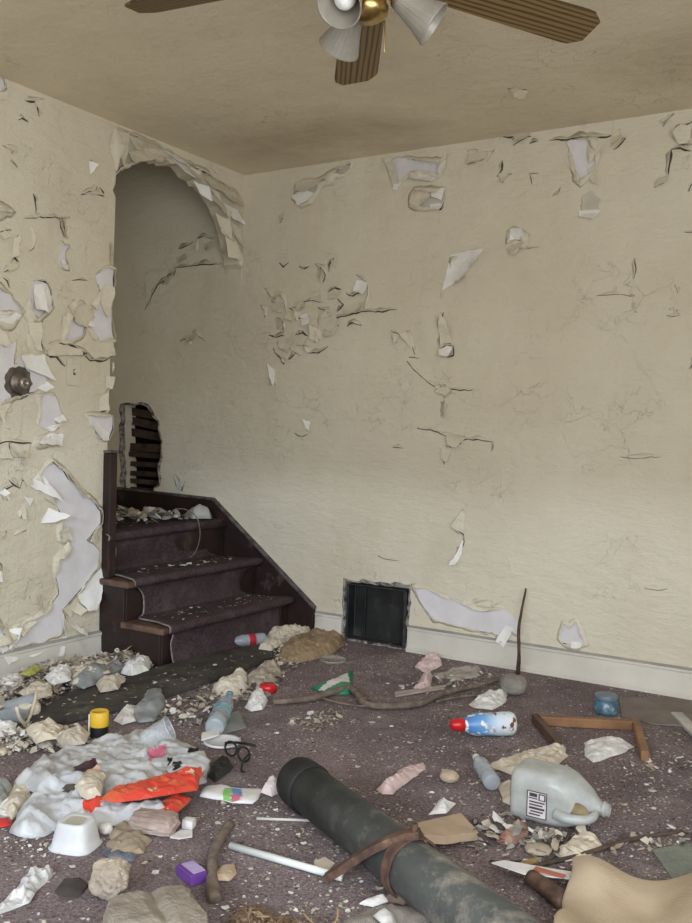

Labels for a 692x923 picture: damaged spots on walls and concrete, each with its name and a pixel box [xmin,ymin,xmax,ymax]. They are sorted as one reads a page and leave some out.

peeling [0,200,16,221]
spalling [109,126,248,268]
peeling [384,155,448,212]
peeling [566,136,609,219]
peeling [442,249,484,291]
crack [260,257,493,465]
spalling [84,402,163,491]
crack [0,438,33,540]
peeling [0,240,117,749]
crack [0,563,8,582]
peeling [342,578,523,650]
peeling [557,618,590,651]